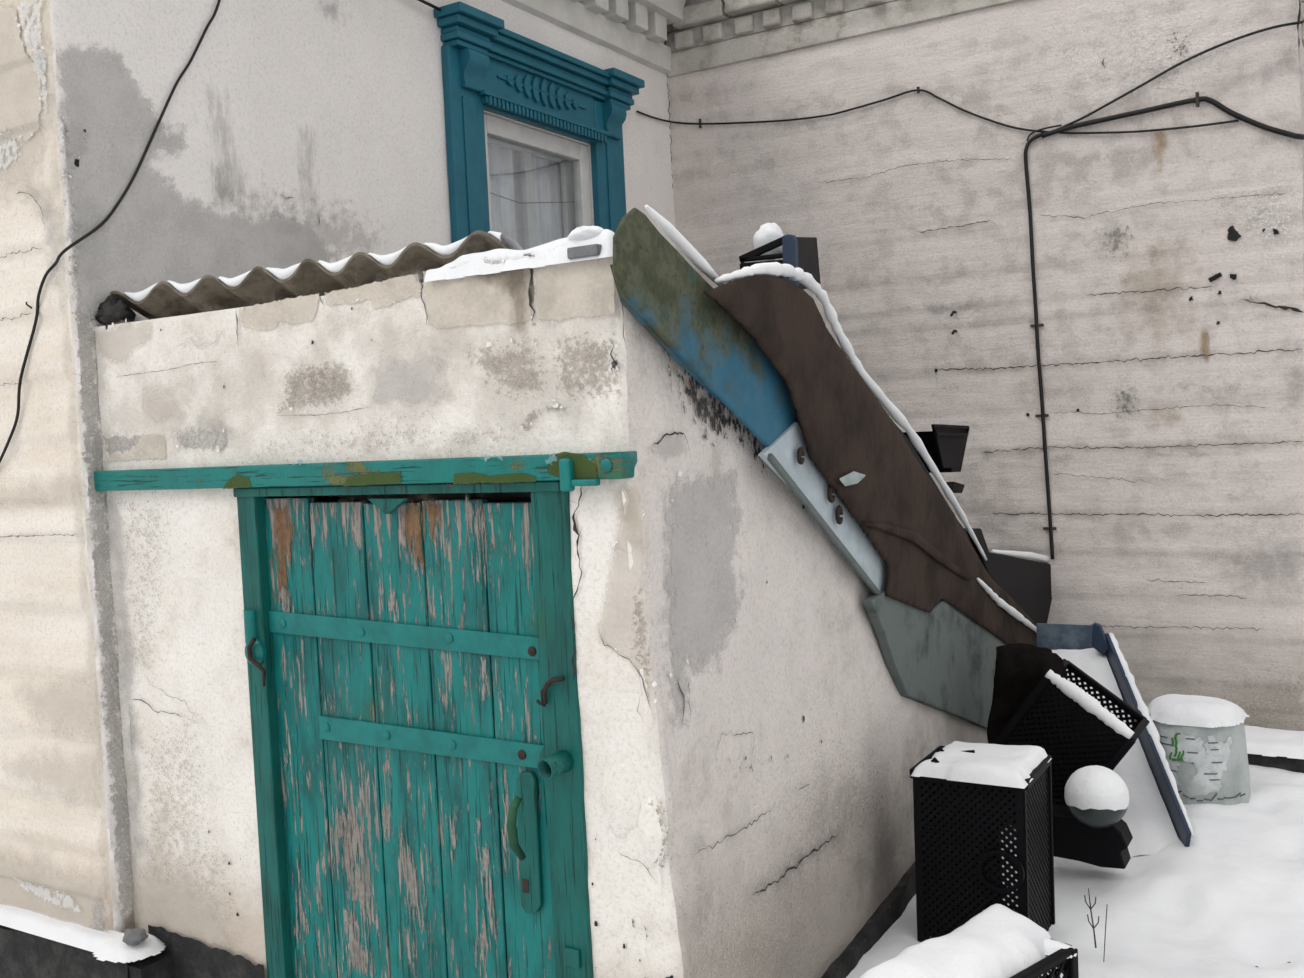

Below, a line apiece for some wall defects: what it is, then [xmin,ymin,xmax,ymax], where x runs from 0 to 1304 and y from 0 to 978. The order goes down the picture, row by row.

crack [0,192,45,258]
crack [527,269,535,320]
crack [1090,286,1212,296]
crack [1242,297,1303,312]
peeling [239,257,623,431]
crack [940,349,1303,371]
crack [570,486,651,716]
peeling [615,571,657,717]
crack [128,677,198,754]
crack [677,677,691,722]
crack [694,809,772,855]
crack [754,835,838,894]